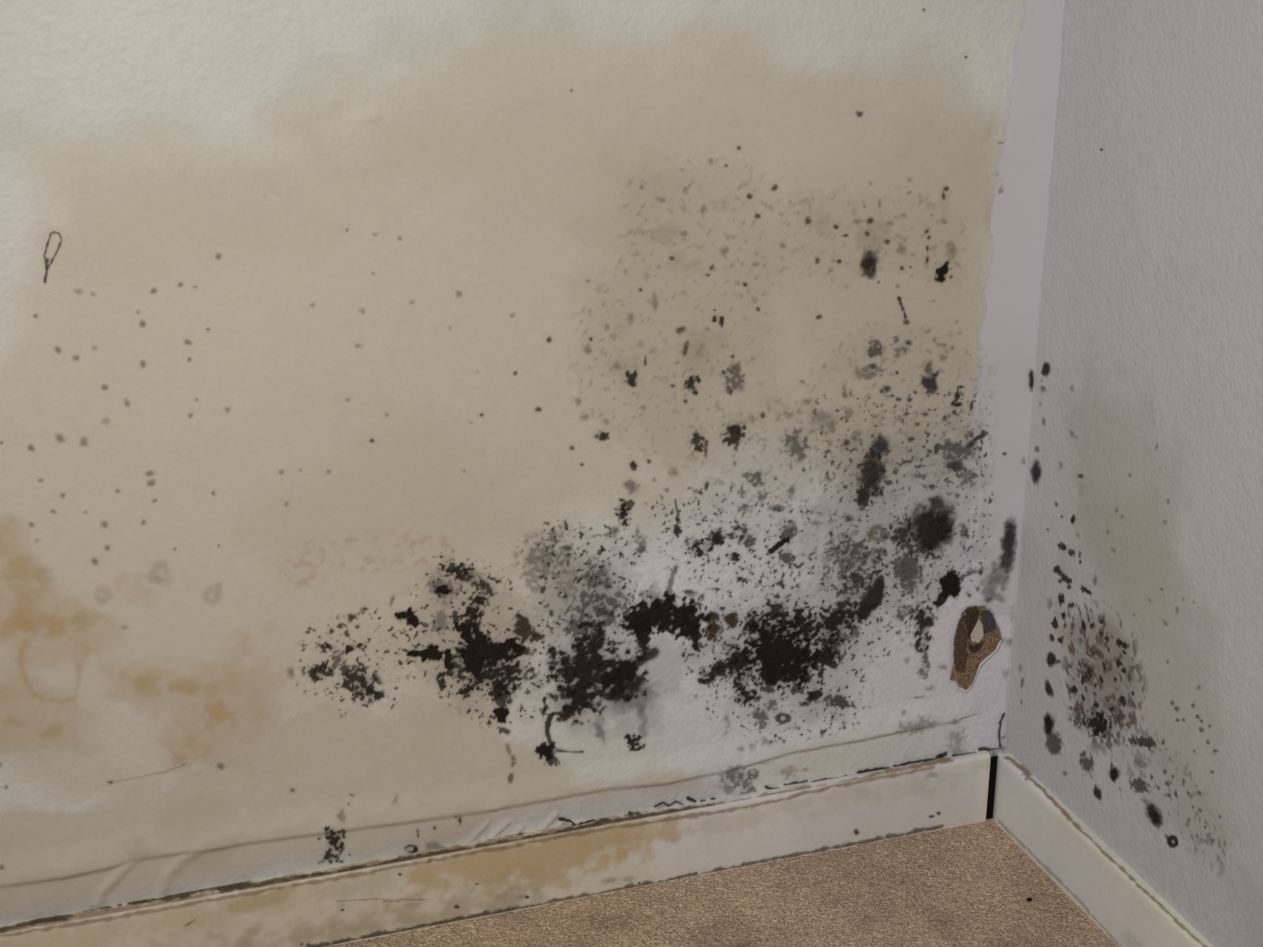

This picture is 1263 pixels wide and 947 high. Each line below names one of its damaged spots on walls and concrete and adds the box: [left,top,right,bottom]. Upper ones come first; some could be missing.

mould [861,251,879,283]
mould [925,230,954,283]
leakage [615,358,646,387]
leakage [671,375,701,403]
leakage [880,340,953,401]
leakage [1029,363,1050,390]
leakage [691,425,776,499]
leakage [1031,461,1041,482]
leakage [0,430,1016,909]
mould [1044,565,1164,771]
peeling [399,605,1004,853]
peeling [0,792,400,899]